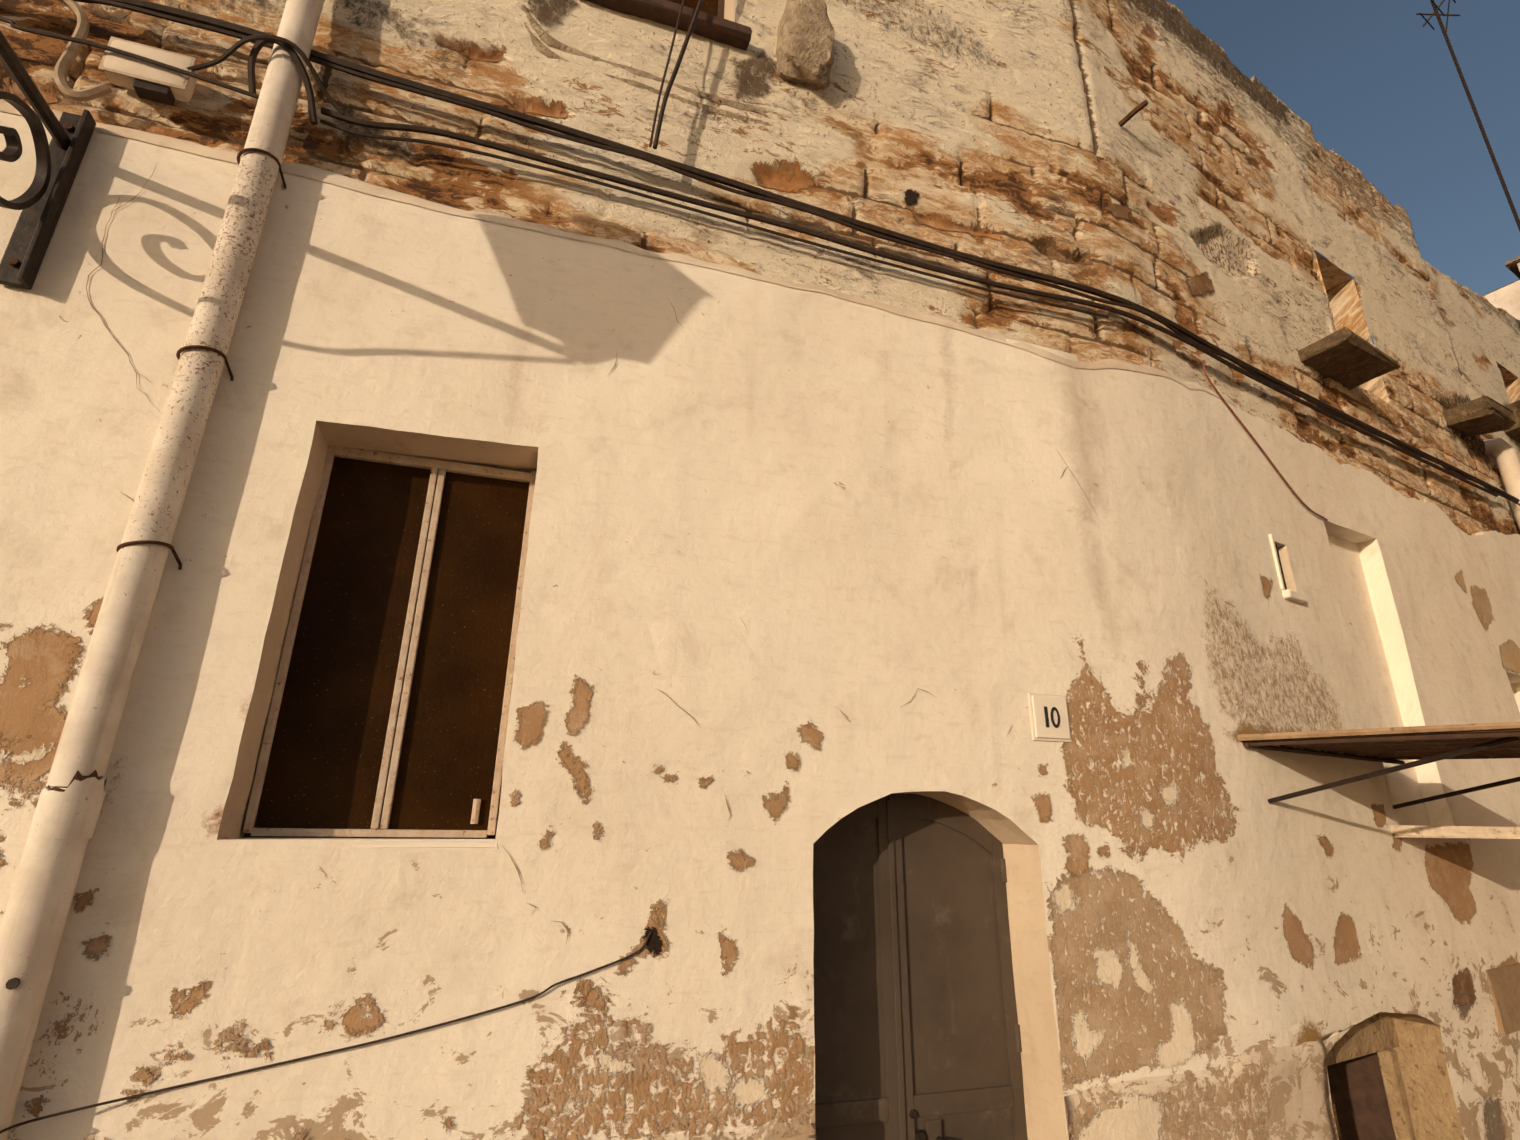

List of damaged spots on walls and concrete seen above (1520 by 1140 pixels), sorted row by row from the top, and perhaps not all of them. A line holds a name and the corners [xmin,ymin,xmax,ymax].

spalling [750,156,816,195]
crack [86,162,158,404]
peeling [0,597,104,866]
peeling [513,674,597,805]
peeling [762,720,823,825]
peeling [726,848,755,872]
peeling [1031,634,1272,1140]
peeling [1424,840,1477,926]
peeling [169,978,211,1020]
peeling [318,992,387,1037]
peeling [498,899,815,1140]
peeling [1452,967,1478,1011]